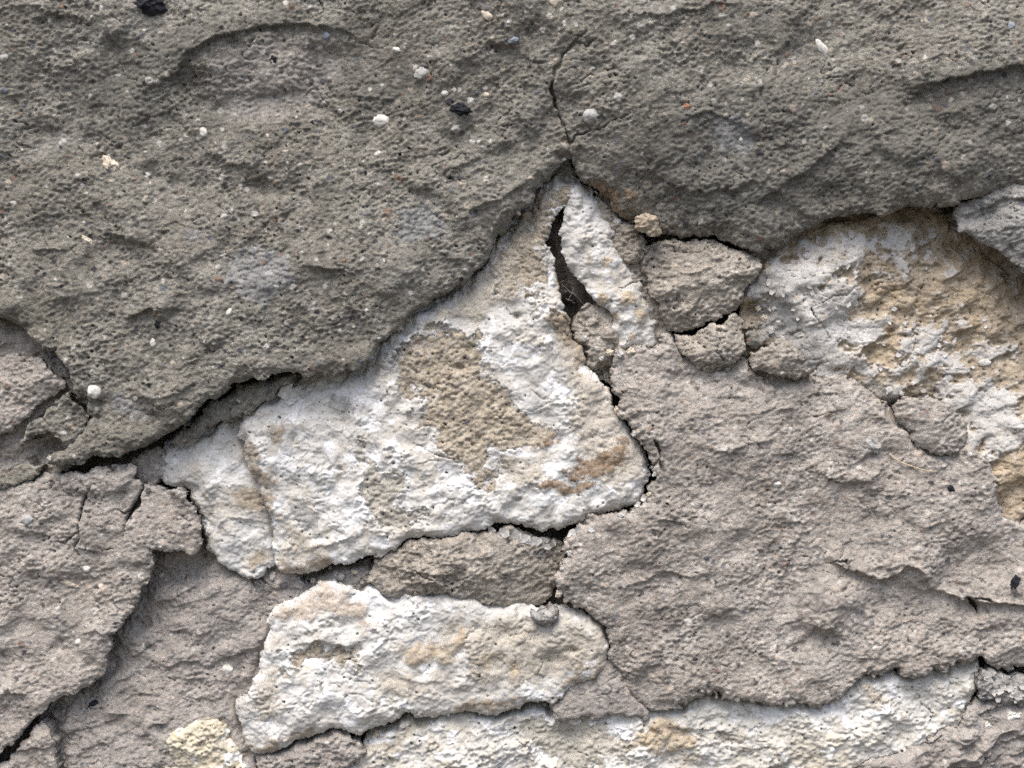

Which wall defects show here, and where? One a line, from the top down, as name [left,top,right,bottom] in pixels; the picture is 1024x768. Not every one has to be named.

spalling [494,186,571,299]
crack [545,237,584,352]
crack [672,307,739,339]
crack [128,489,144,519]
spalling [354,442,428,539]
spalling [396,324,558,492]
peeling [488,526,594,550]
crack [551,524,576,556]
crack [599,380,661,505]
spalling [36,529,306,768]
crack [966,597,994,612]
peeling [984,673,1024,720]